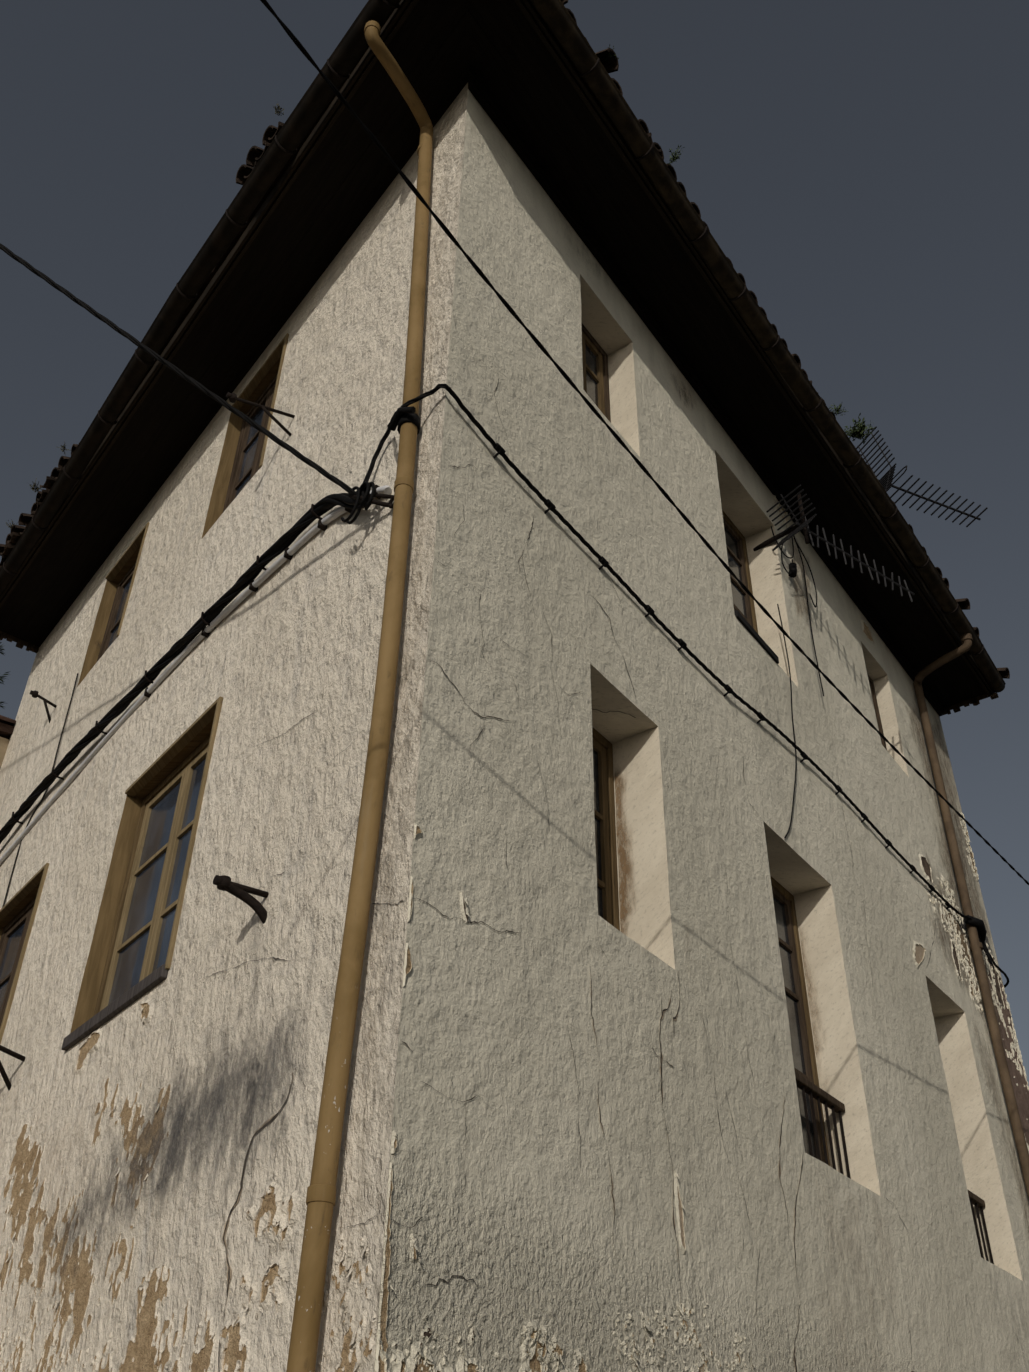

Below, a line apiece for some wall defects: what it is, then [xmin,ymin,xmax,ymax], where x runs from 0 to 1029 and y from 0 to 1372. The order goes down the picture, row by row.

crack [432,484,636,770]
water stain [913,709,999,1021]
peeling [75,1028,103,1076]
peeling [0,1064,300,1372]
water stain [54,1059,268,1242]
crack [218,1072,293,1369]
peeling [317,1131,500,1372]
crack [424,1229,480,1286]
peeling [519,1319,588,1372]
crack [567,928,618,1263]
peeling [588,1296,756,1372]
crack [653,875,803,1372]